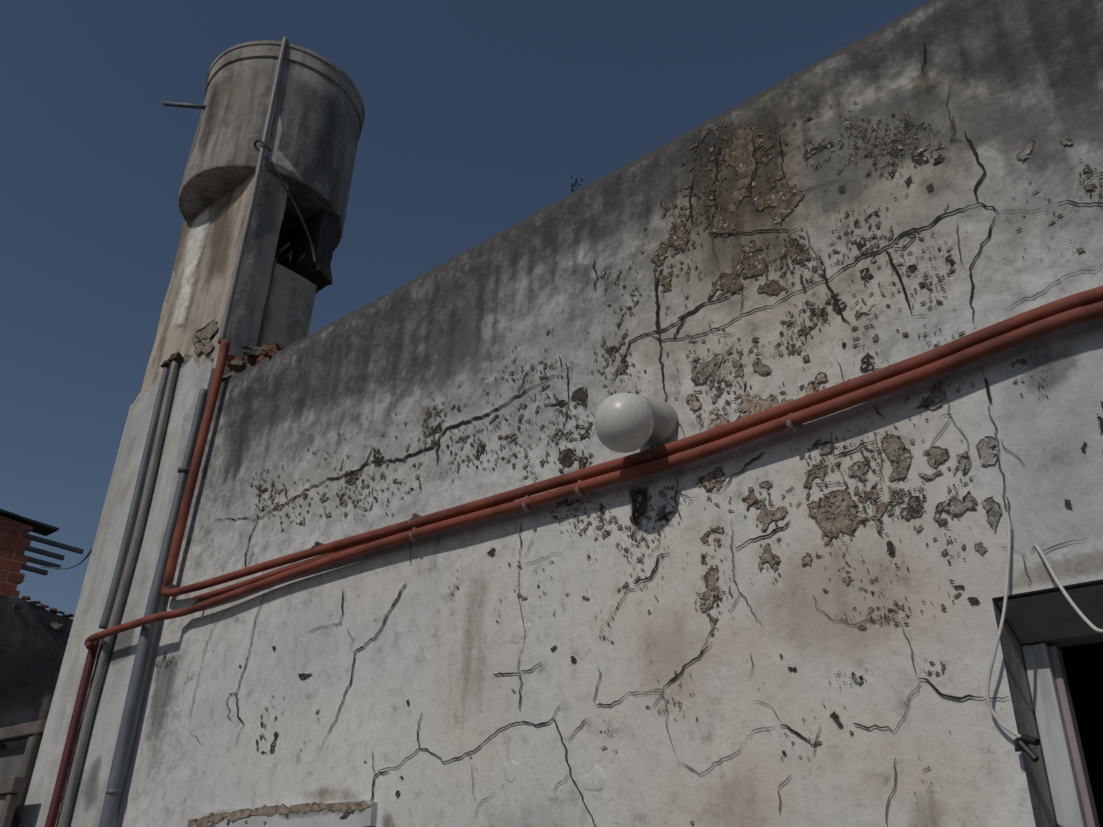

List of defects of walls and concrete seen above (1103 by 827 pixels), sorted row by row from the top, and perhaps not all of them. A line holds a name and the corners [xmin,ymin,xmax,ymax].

leakage [267,115,293,170]
spalling [223,343,288,378]
crack [217,356,575,568]
peeling [247,99,965,531]
peeling [550,373,1002,643]
crack [621,86,1103,436]
crack [981,370,1087,585]
peeling [256,695,285,754]
spalling [187,801,372,827]
crack [307,542,411,748]
crack [370,520,821,827]
crack [813,595,1009,732]